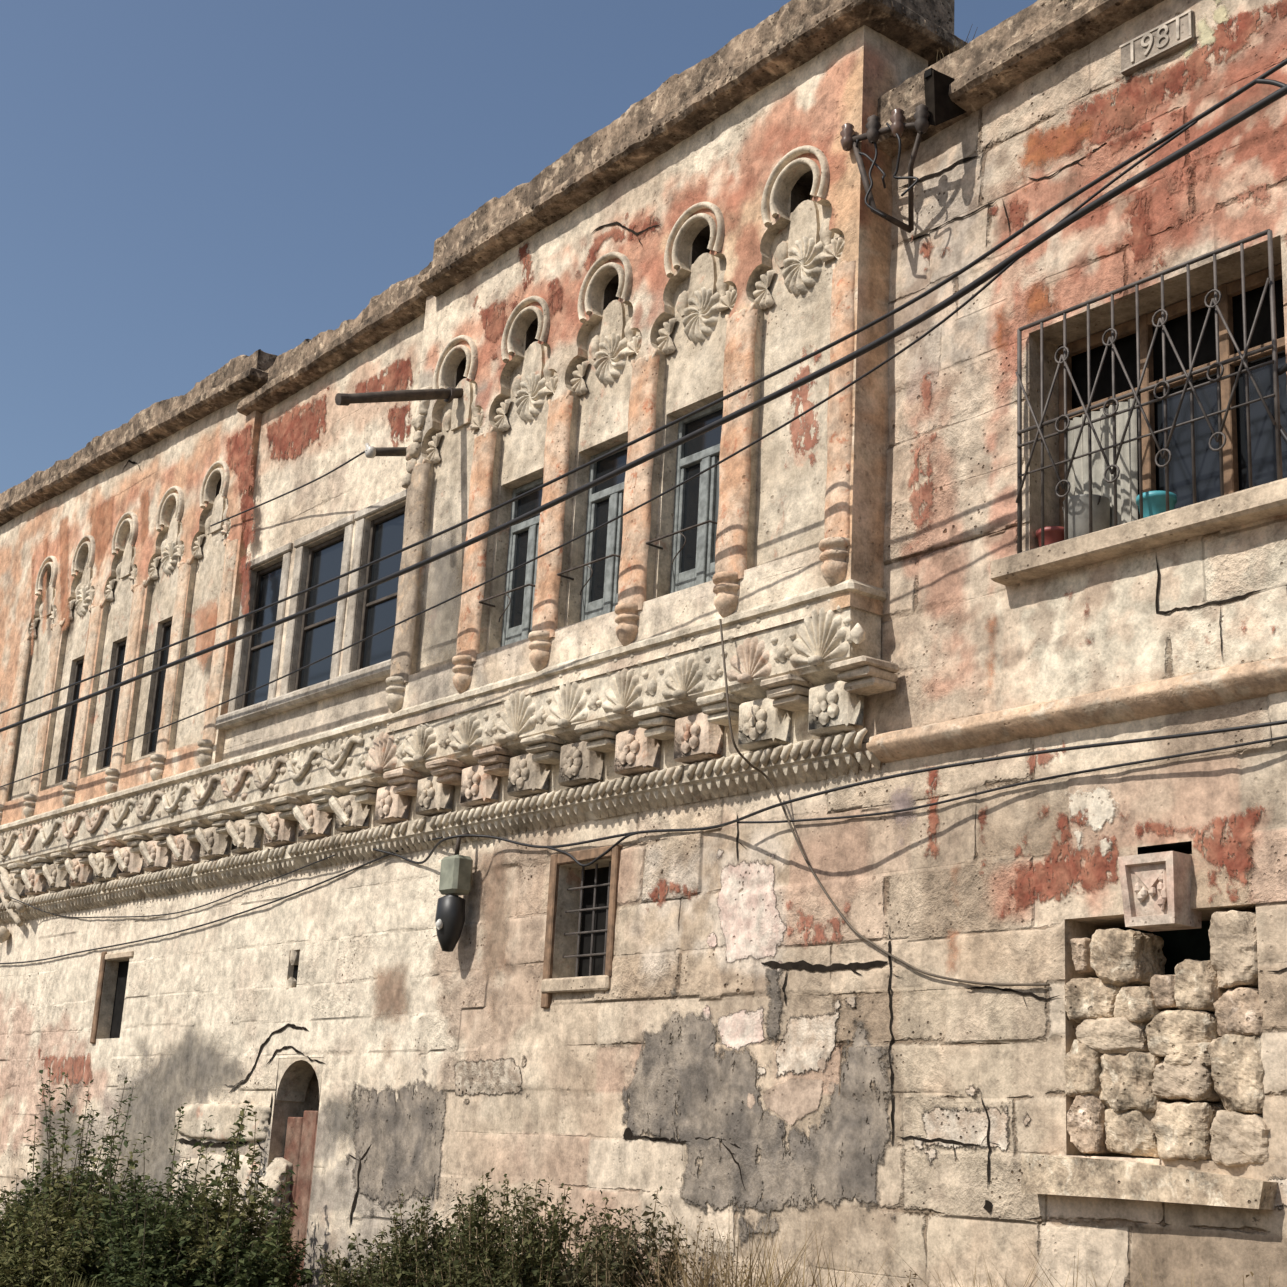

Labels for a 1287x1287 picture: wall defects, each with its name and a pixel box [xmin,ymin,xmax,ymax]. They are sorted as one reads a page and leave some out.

peeling [1067,0,1287,158]
crack [591,221,661,247]
peeling [1236,183,1270,207]
peeling [267,387,329,469]
peeling [1000,806,1119,918]
peeling [1121,805,1265,902]
crack [177,1023,325,1151]
crack [348,1145,371,1227]